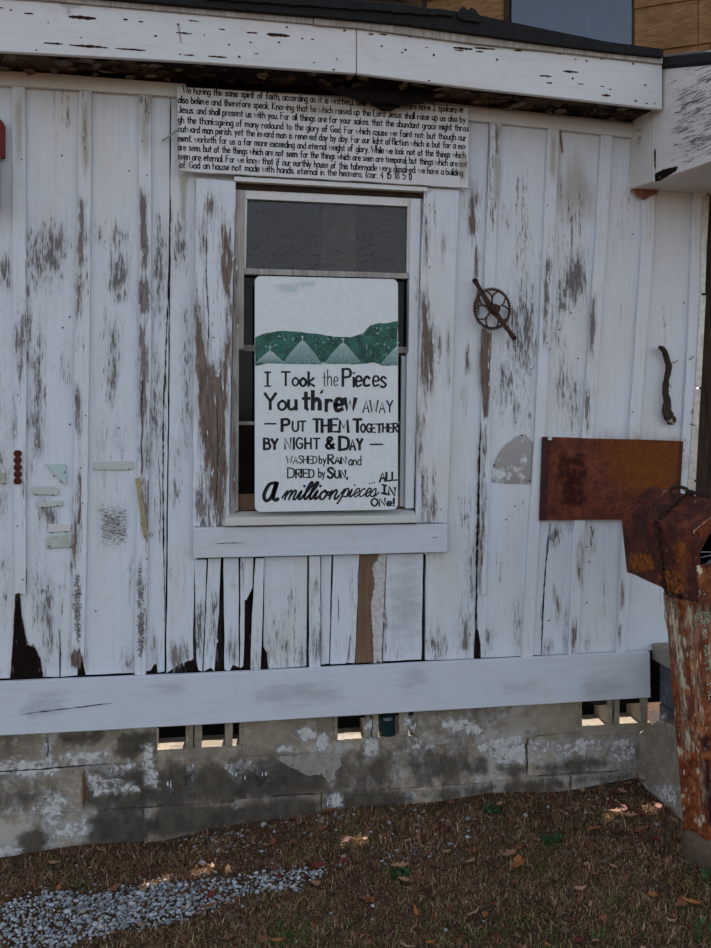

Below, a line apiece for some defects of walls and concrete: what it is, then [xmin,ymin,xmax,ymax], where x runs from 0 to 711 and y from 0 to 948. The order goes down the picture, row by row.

peeling [0,37,146,78]
peeling [468,194,479,236]
peeling [27,189,187,467]
peeling [171,225,239,527]
peeling [418,292,450,392]
peeling [466,252,597,599]
rust [539,437,683,521]
peeling [72,572,83,659]
peeling [121,560,157,673]
rust [628,542,690,594]
spalling [276,753,342,783]
leakage [0,718,635,857]